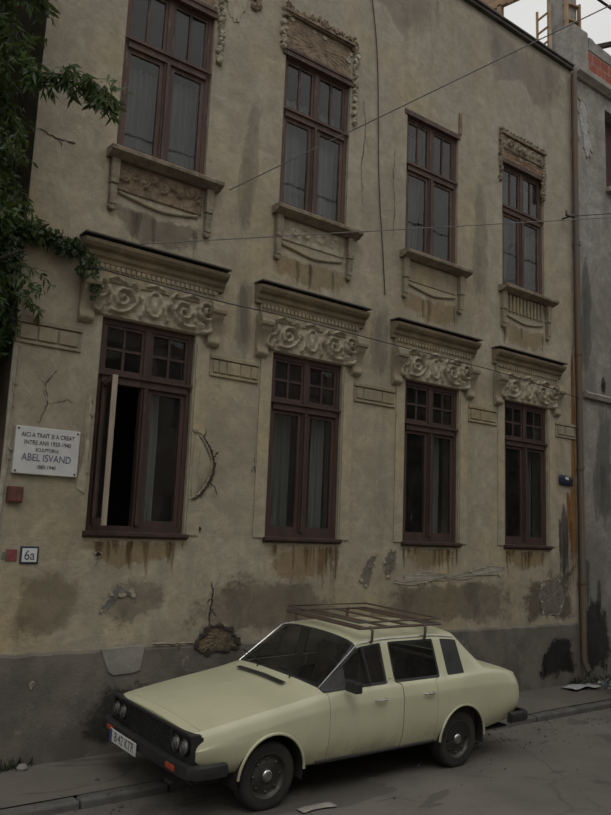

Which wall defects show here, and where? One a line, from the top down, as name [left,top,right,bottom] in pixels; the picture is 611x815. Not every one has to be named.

crack [37,369,74,423]
crack [188,428,219,501]
leakage [555,506,573,619]
flaking render [194,623,241,656]